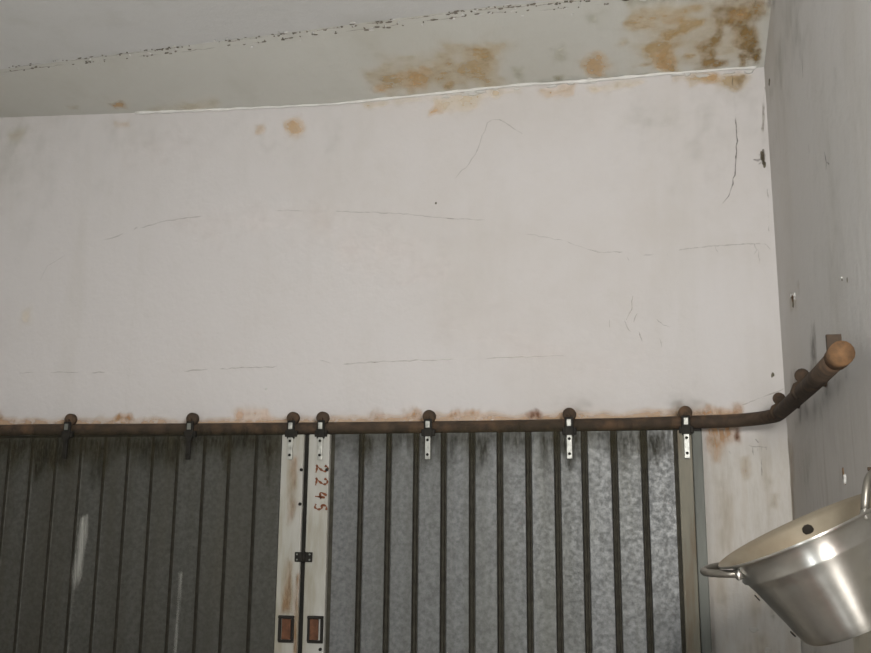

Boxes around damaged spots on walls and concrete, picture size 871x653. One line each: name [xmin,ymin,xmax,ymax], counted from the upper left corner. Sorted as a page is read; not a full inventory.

water stain [693,3,761,88]
crack [758,149,766,168]